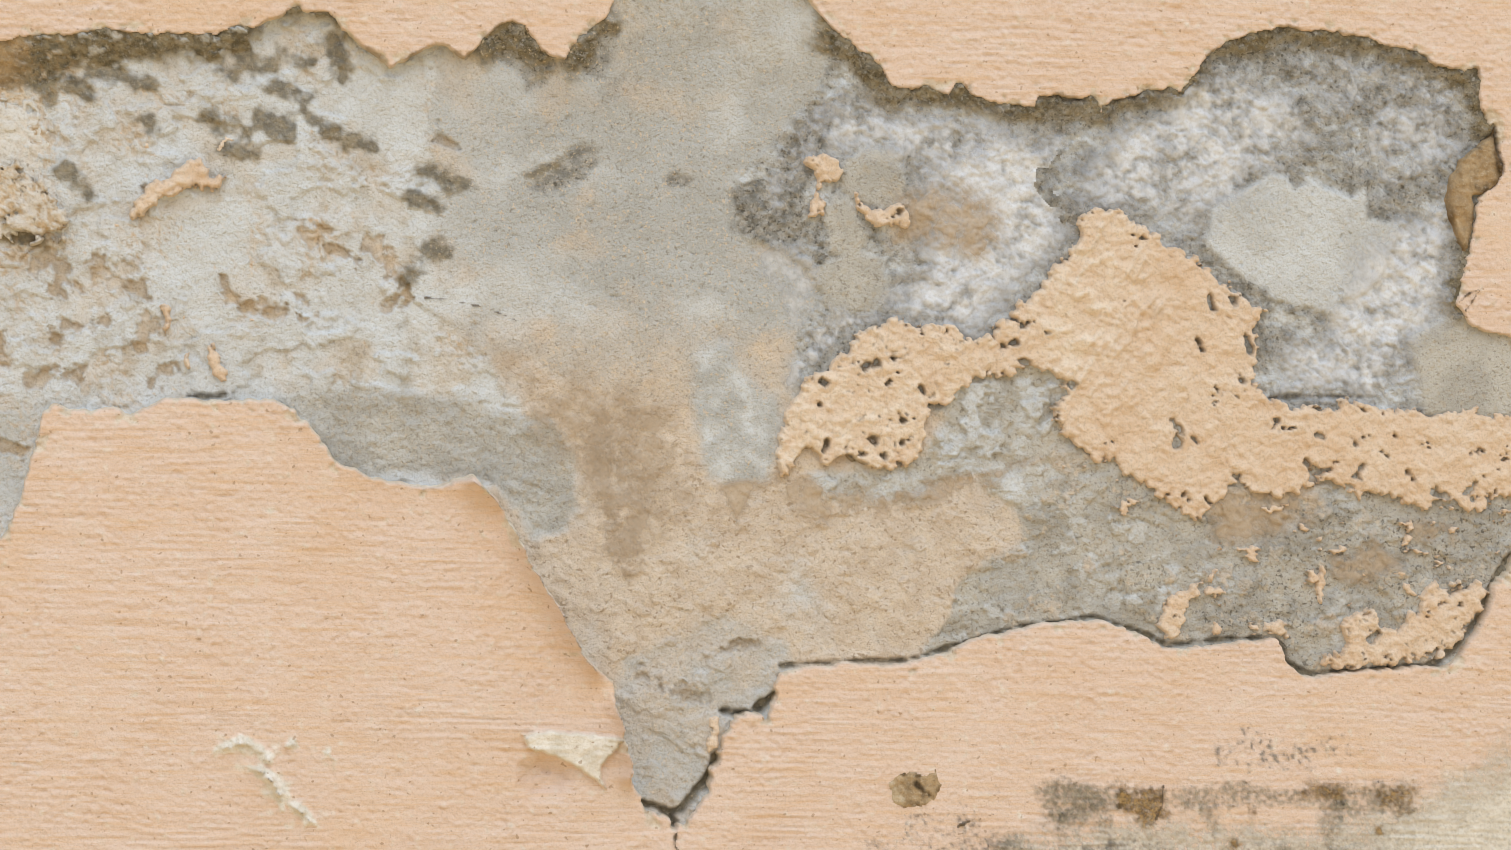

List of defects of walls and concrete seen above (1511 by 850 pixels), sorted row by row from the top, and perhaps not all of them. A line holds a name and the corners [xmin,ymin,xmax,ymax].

flaking render [0,98,71,246]
peeling [854,192,910,229]
leakage [816,108,1065,332]
leakage [1073,75,1310,222]
leakage [1369,76,1459,183]
flaking render [1444,127,1503,251]
peeling [775,207,1511,521]
leakage [1281,209,1453,401]
leakage [1215,488,1301,540]
peeling [1319,578,1490,670]
flaking render [889,769,942,808]
leakage [1044,786,1398,822]